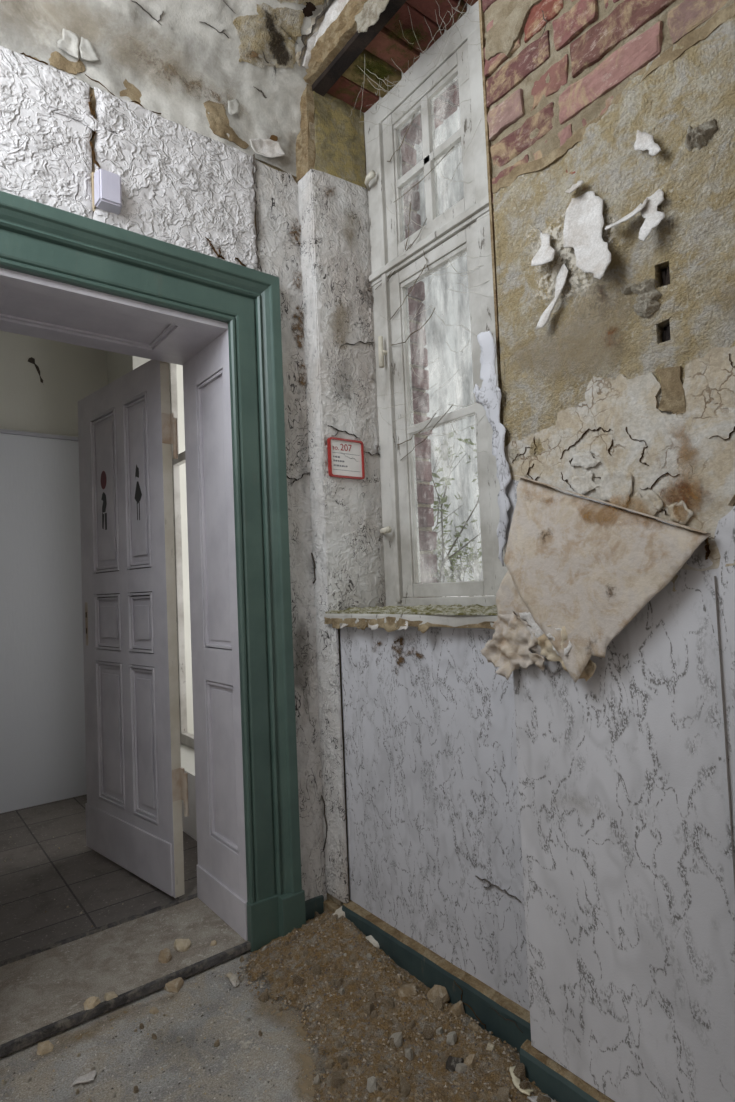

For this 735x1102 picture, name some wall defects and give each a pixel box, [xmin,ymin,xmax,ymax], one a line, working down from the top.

spalling [49,29,100,75]
crack [252,153,260,268]
flaking render [203,0,735,592]
damp [292,306,304,349]
peeling [331,622,429,633]
crack [475,876,522,903]